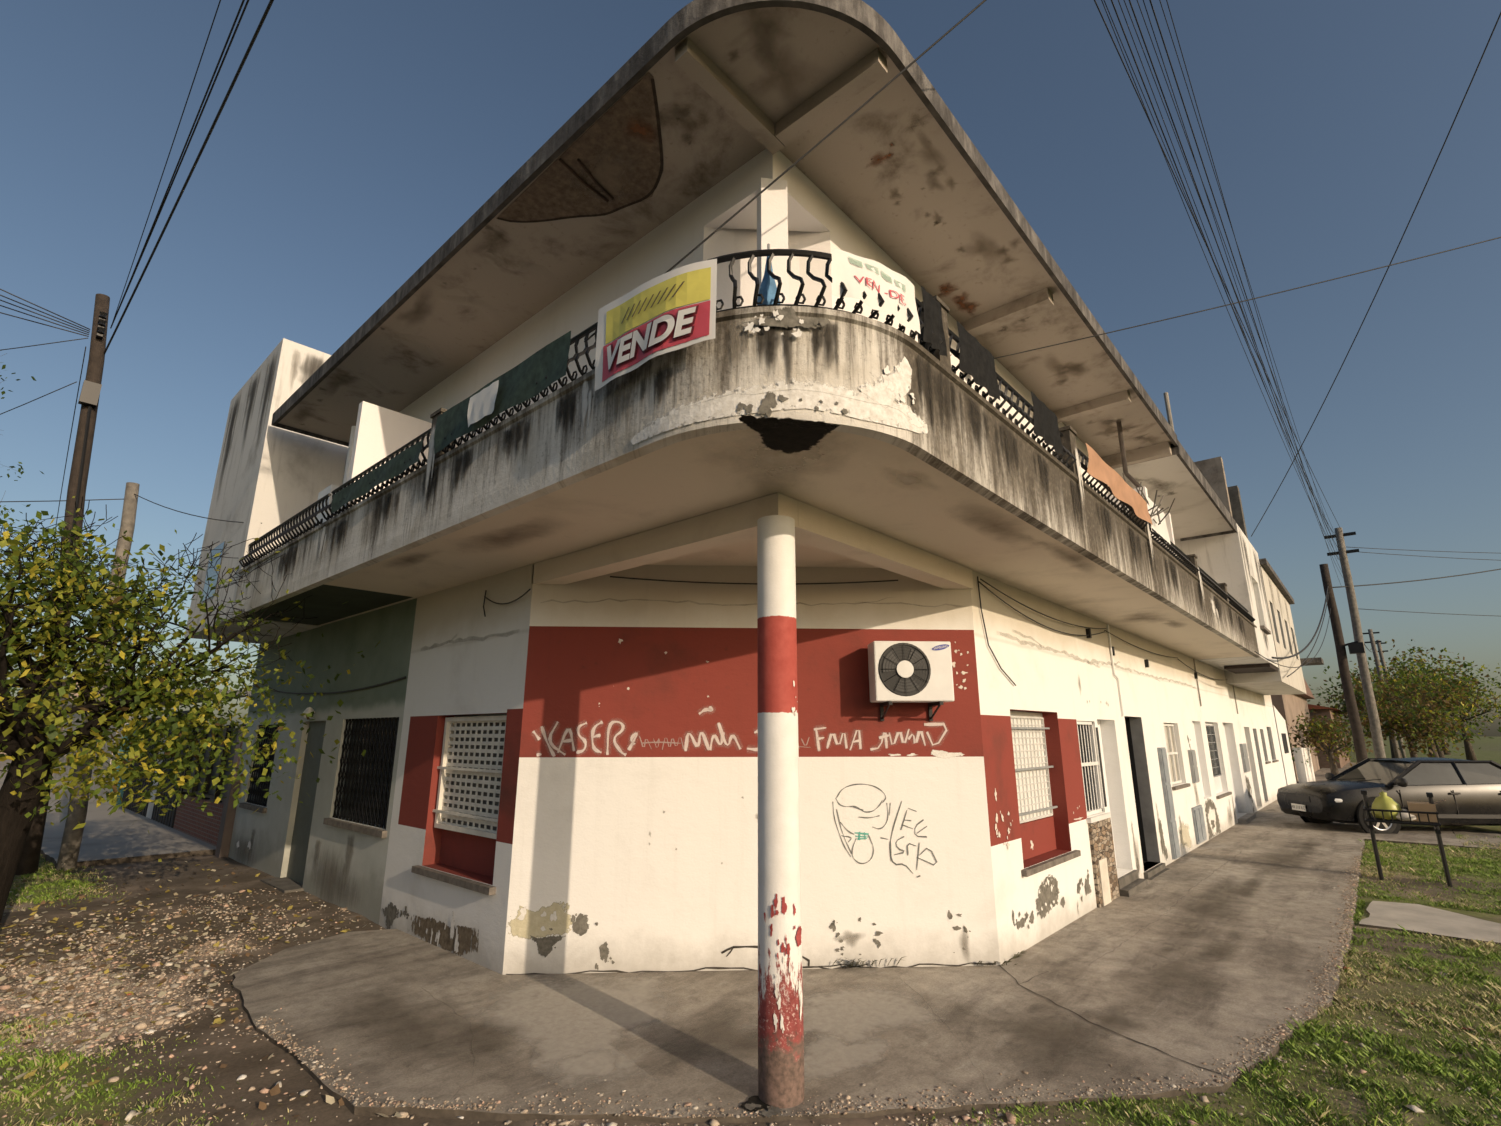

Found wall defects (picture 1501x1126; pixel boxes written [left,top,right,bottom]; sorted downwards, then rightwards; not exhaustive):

corrosion [937,285,977,313]
water stain [732,326,792,376]
water stain [813,324,838,364]
spalling [737,391,848,454]
peeling [857,356,924,428]
water stain [918,358,1048,487]
water stain [1071,449,1178,589]
water stain [1197,568,1245,633]
peeling [382,902,479,956]
peeling [507,901,598,957]
peeling [1012,870,1092,930]
peeling [764,894,802,1032]